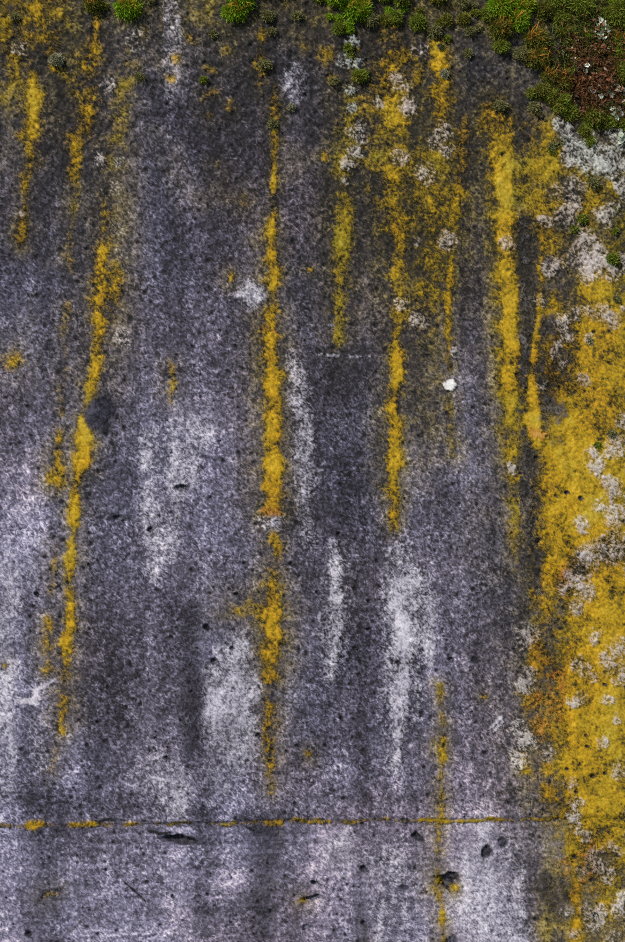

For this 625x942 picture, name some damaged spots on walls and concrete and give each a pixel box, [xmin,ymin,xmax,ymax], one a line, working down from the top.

water stain [42,243,124,676]
water stain [140,423,211,581]
water stain [152,570,284,819]
water stain [236,212,317,555]
water stain [321,540,347,679]
water stain [385,221,407,529]
water stain [384,545,438,774]
water stain [481,103,558,552]
crack [0,820,45,830]
crack [68,818,389,835]
water stain [433,815,583,942]
crack [419,813,624,823]